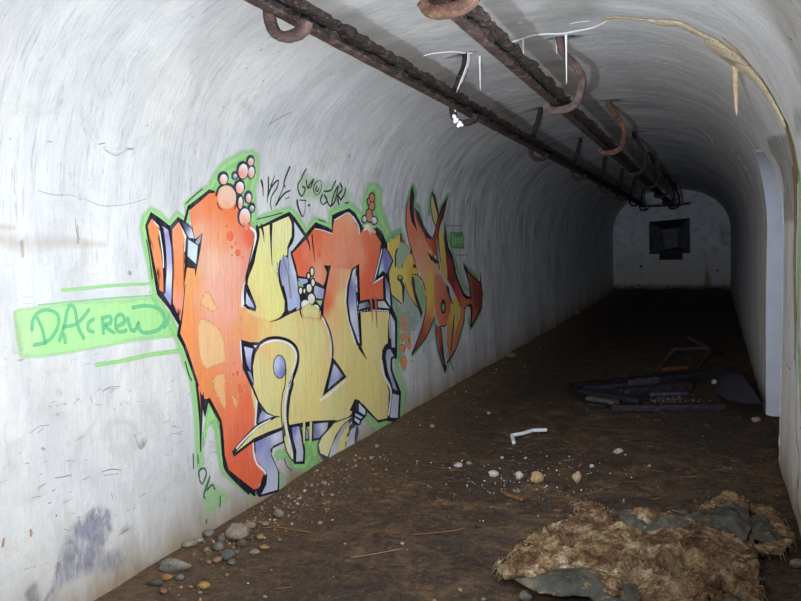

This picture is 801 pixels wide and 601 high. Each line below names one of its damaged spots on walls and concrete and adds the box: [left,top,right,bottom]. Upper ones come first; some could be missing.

crack [424,49,473,57]
crack [512,16,798,366]